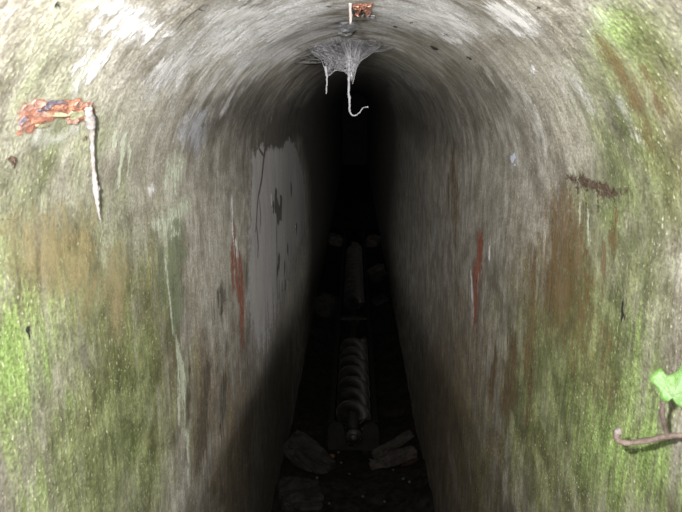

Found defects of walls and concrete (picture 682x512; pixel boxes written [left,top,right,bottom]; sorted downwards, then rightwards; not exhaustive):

corrosion [230,221,245,349]
corrosion [473,230,483,333]